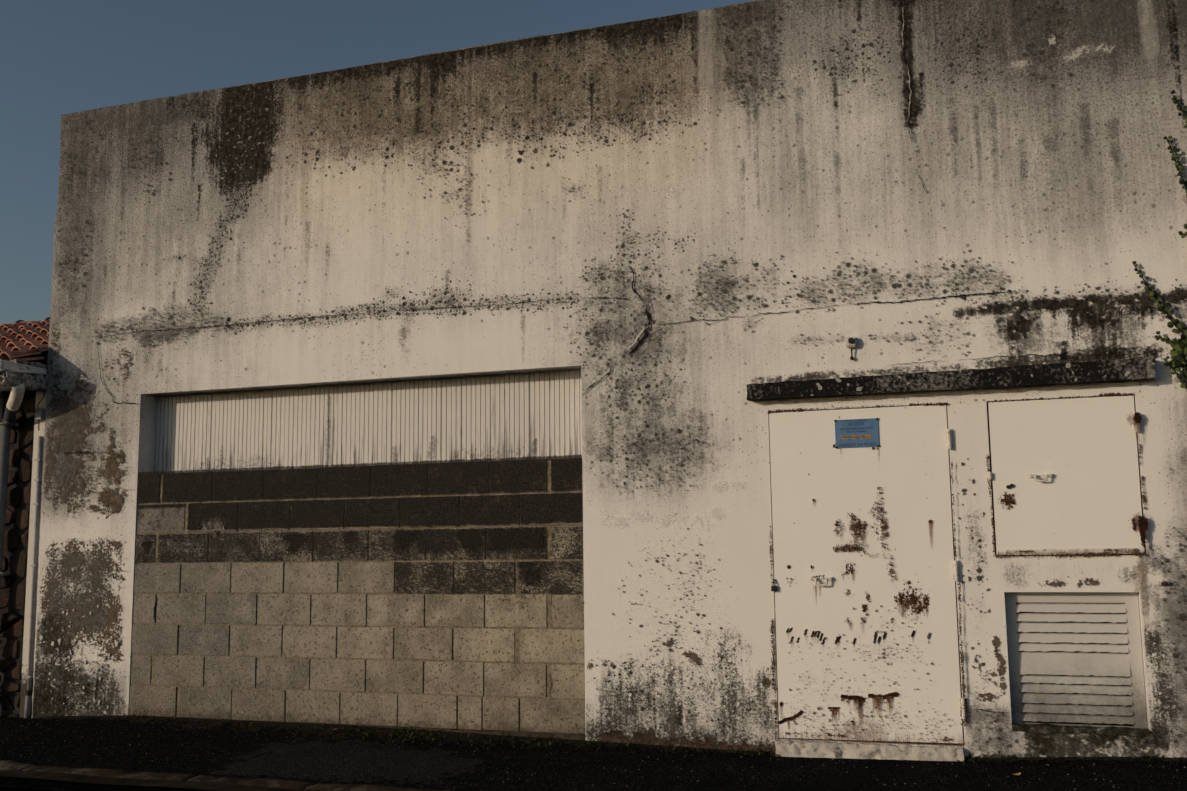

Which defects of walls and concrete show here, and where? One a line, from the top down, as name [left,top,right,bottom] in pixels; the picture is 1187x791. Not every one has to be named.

crack [59,265,1019,406]
damp [55,0,1187,613]
corrosion [999,492,1016,510]
damp [32,610,146,718]
damp [510,636,778,755]
corrosion [770,487,968,748]
damp [963,522,1187,761]